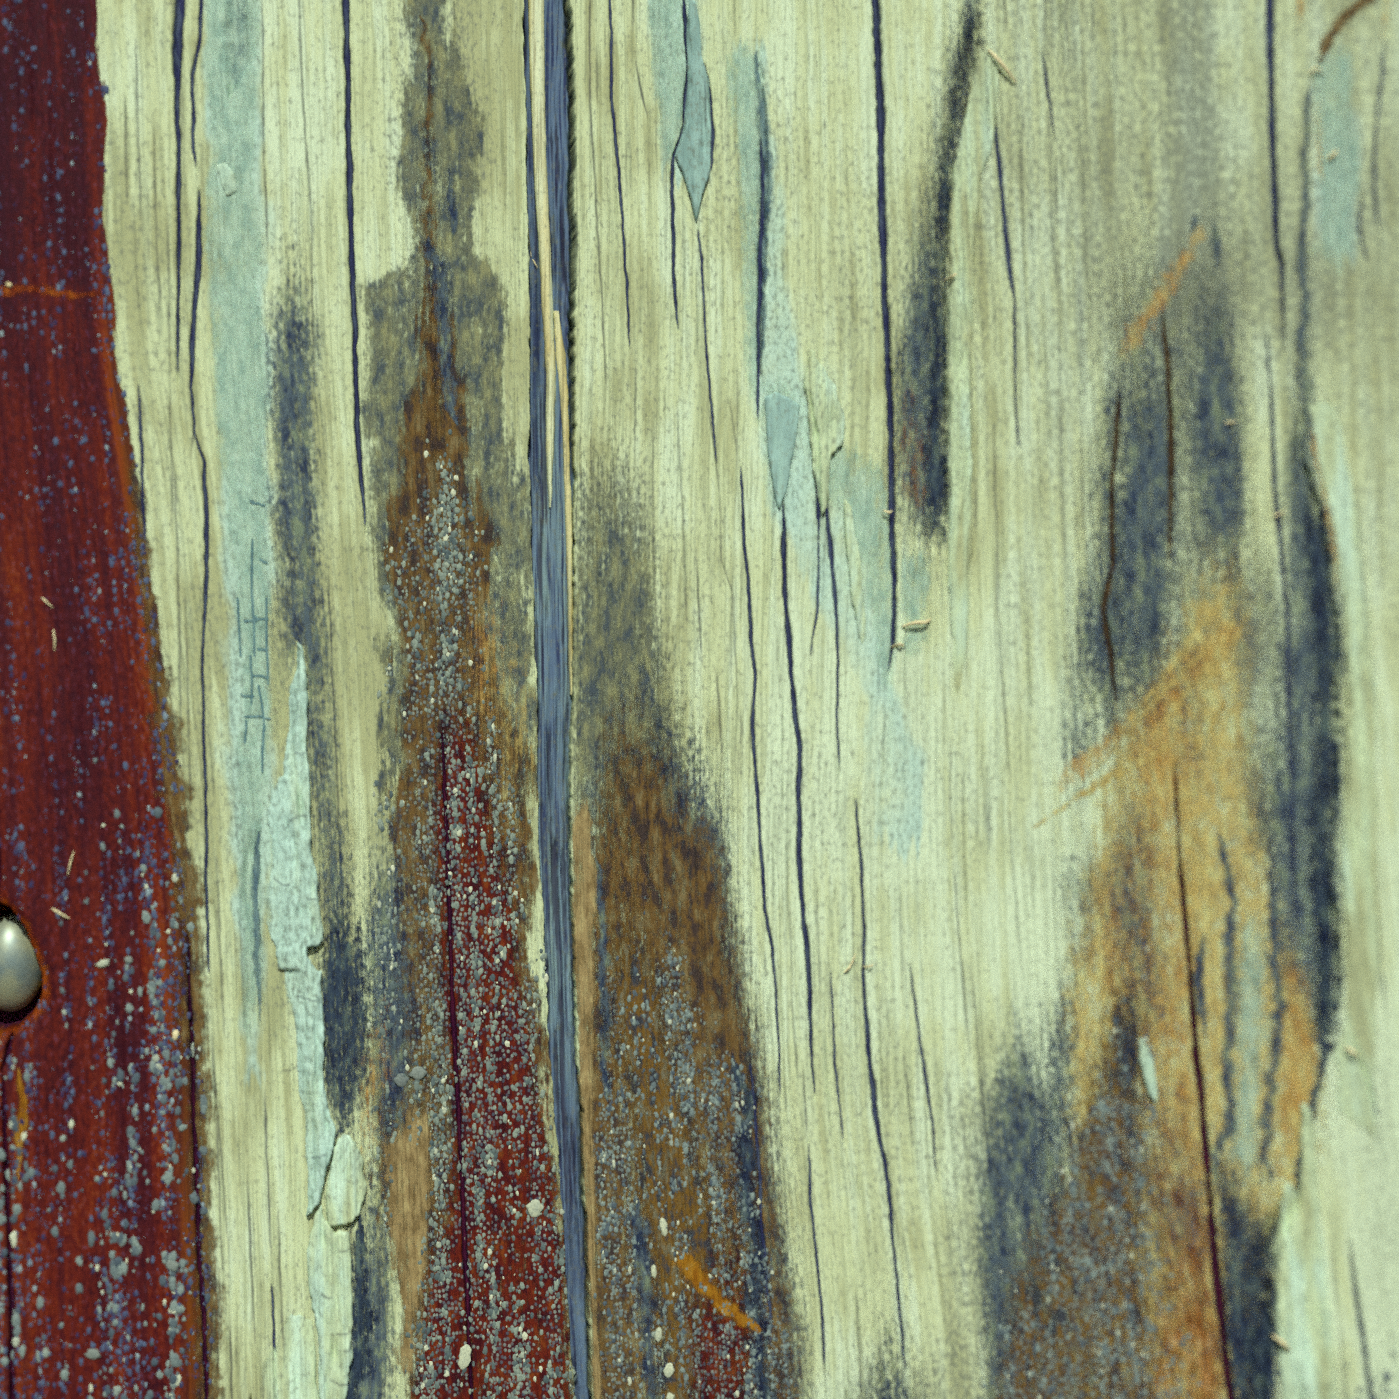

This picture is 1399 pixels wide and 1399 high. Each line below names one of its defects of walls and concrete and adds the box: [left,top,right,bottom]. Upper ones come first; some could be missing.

peeling [0,0,224,1399]
peeling [206,0,367,1399]
crack [342,0,366,524]
leakage [266,0,809,1399]
crack [609,0,630,347]
crack [670,0,906,1369]
leakage [893,0,983,560]
leakage [977,88,1346,1399]
crack [1162,315,1175,561]
crack [1266,0,1297,923]
leakage [1317,0,1376,64]
leakage [845,1341,925,1399]